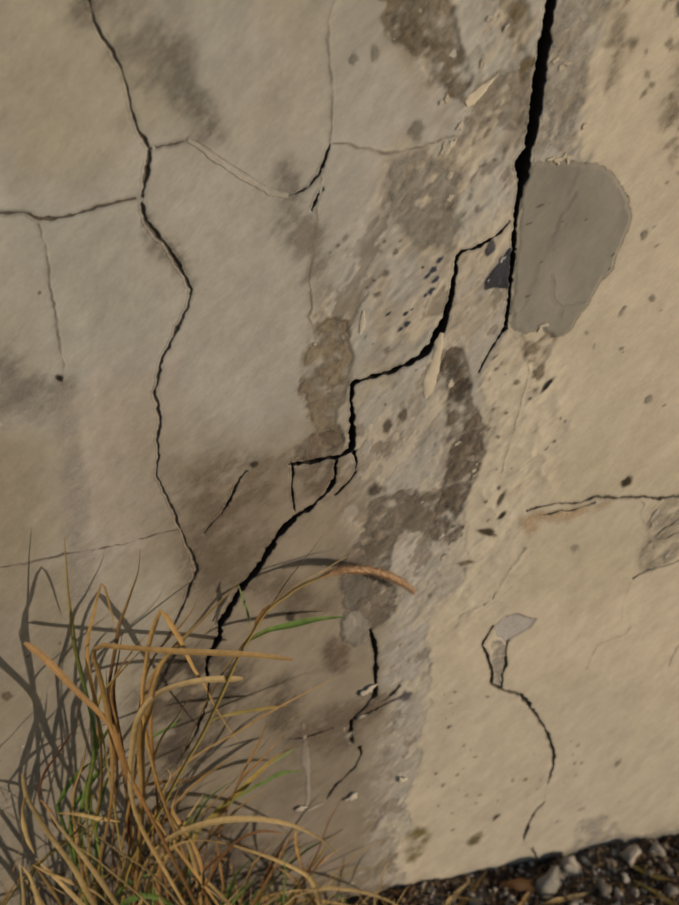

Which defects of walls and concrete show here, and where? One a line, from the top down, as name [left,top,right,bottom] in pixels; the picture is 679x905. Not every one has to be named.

flaking render [381,0,535,126]
peeling [538,0,604,165]
peeling [387,118,467,247]
crack [0,0,465,647]
flaking render [298,317,353,460]
crack [174,0,559,764]
damp [384,409,407,432]
crack [289,629,400,811]
crack [450,546,558,862]
peeling [492,613,536,684]
crack [527,493,679,670]